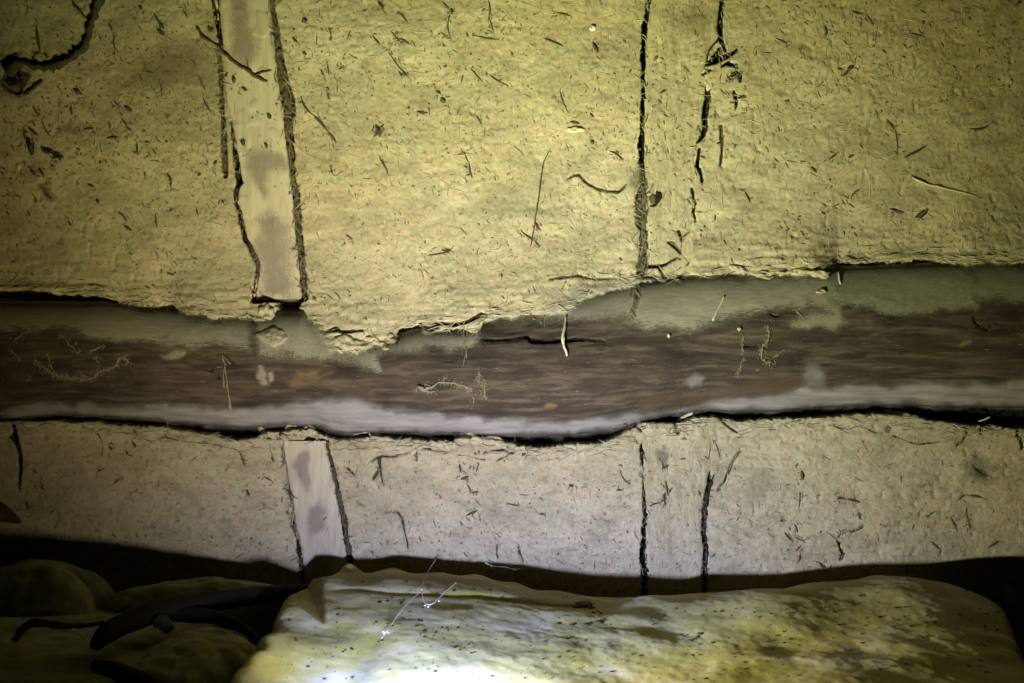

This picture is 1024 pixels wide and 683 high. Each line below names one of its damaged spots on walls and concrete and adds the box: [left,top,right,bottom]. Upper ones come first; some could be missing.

crack [211,0,222,45]
peeling [301,97,337,143]
peeling [17,106,64,199]
crack [549,0,745,324]
crack [231,121,259,298]
peeling [890,208,929,218]
spalling [729,264,831,294]
spalling [319,324,397,355]
spalling [420,314,487,333]
spalling [641,421,676,437]
crack [632,437,650,596]
crack [699,450,742,593]